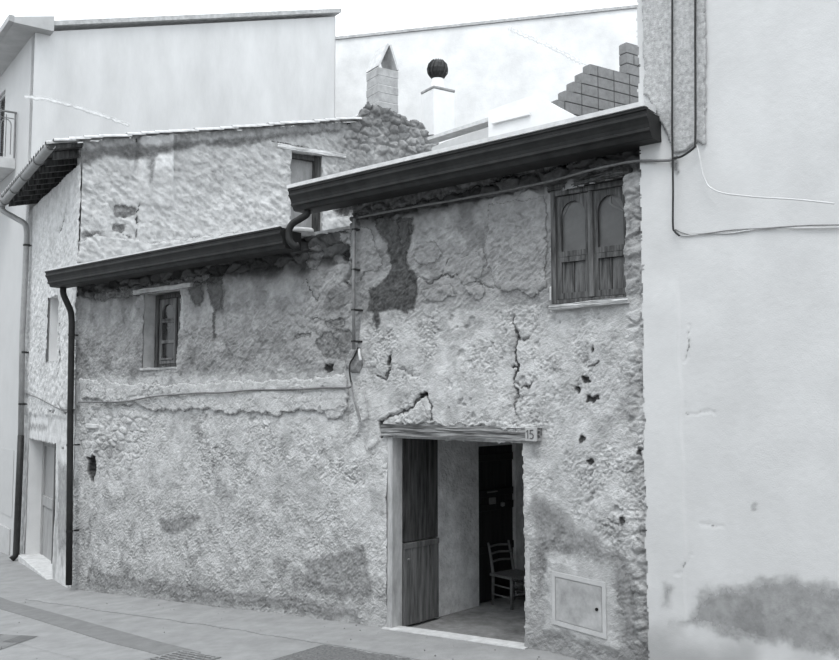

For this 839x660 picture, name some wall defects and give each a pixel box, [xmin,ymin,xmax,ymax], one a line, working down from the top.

spalling [334,161,578,216]
spalling [112,205,136,233]
peeling [484,196,551,301]
spalling [295,317,352,373]
crack [512,318,532,415]
crack [386,396,433,420]
leakage [694,581,839,650]